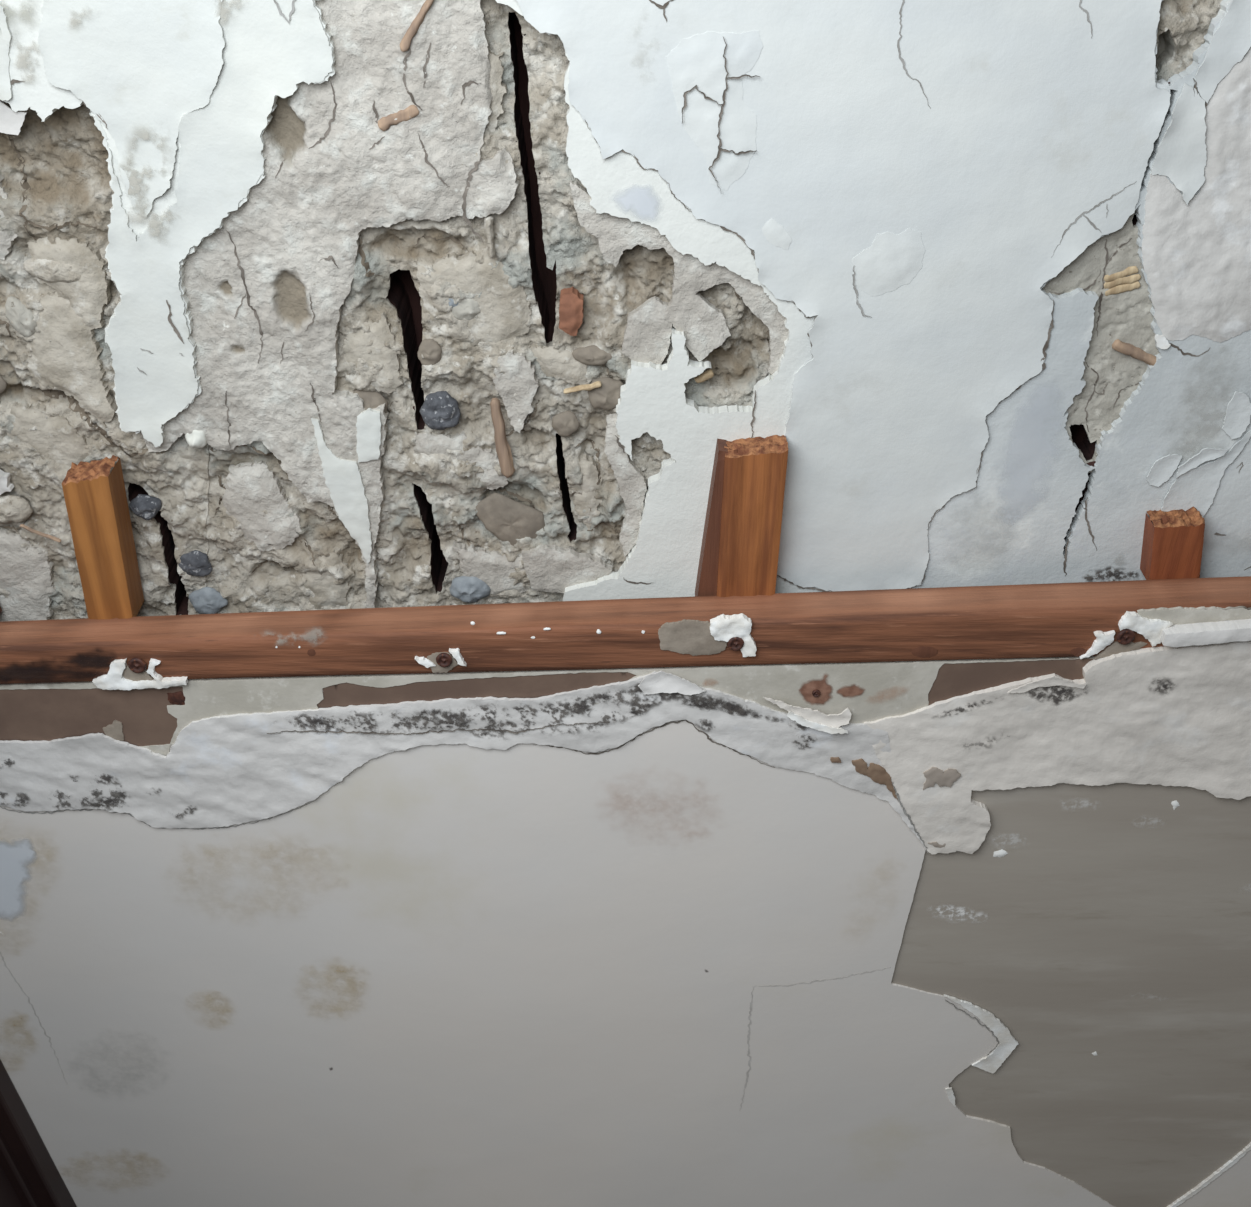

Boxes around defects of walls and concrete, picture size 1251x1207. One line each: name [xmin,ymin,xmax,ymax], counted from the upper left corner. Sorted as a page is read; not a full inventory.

crack [682,37,760,190]
crack [386,269,425,430]
peeling [0,0,1251,622]
crack [412,483,448,593]
crack [556,433,577,542]
water stain [294,684,778,736]
corrosion [799,675,864,704]
water stain [1029,685,1086,704]
water stain [0,792,29,806]
water stain [56,775,126,810]
peeling [923,767,961,790]
peeling [891,783,1251,1207]